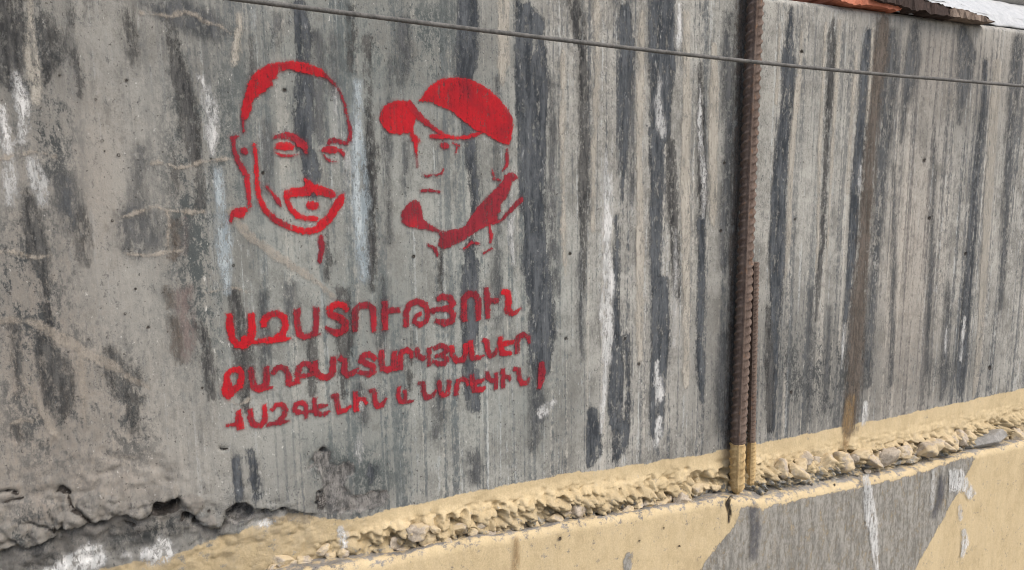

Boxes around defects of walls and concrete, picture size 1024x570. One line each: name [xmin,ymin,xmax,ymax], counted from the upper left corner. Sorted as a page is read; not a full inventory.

damp [0,0,92,422]
damp [492,0,734,468]
corrosion [724,0,747,447]
damp [765,6,803,433]
corrosion [842,14,890,448]
damp [925,24,1023,400]
spalling [149,498,196,521]
spalling [225,502,267,525]